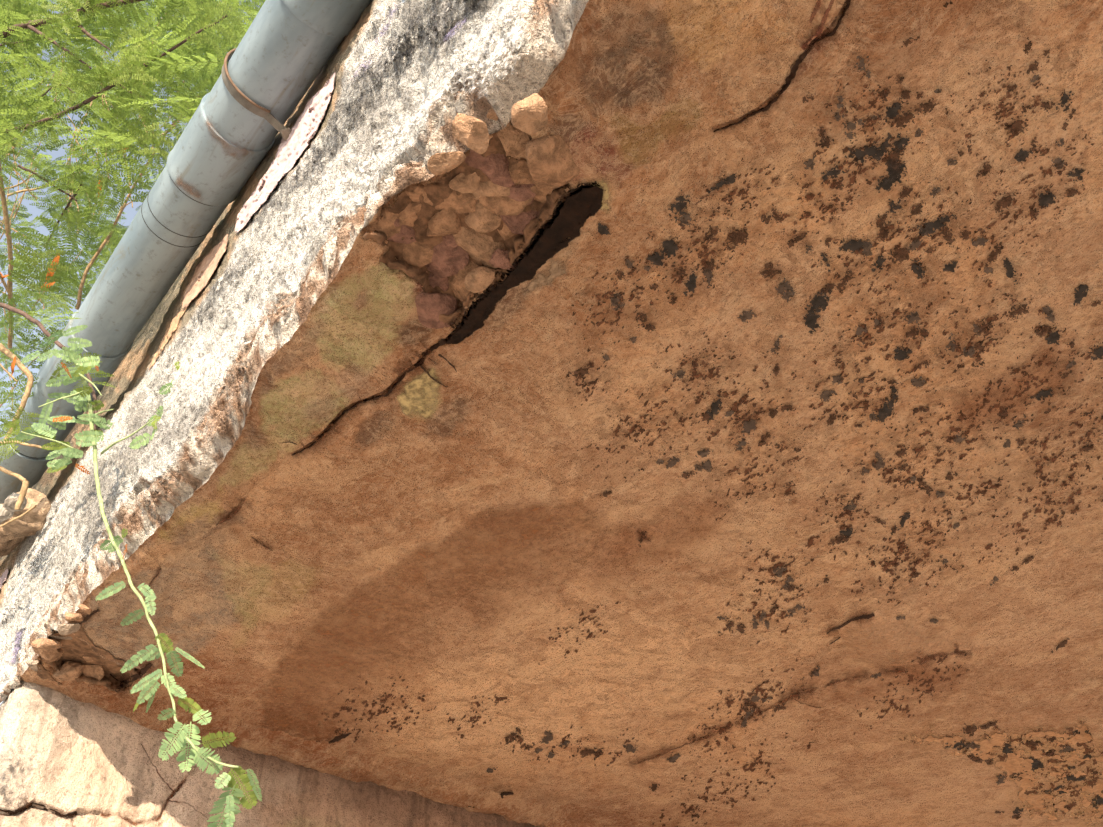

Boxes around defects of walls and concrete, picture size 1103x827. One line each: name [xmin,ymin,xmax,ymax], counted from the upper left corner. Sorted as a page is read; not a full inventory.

crack [713,0,851,132]
flaking render [361,93,609,344]
crack [282,327,461,455]
water stain [561,37,1103,646]
flaking render [11,604,142,693]
crack [0,744,203,825]
water stain [265,504,590,747]
water stain [500,725,646,767]
water stain [547,602,621,658]
water stain [649,658,820,827]
water stain [855,649,969,730]